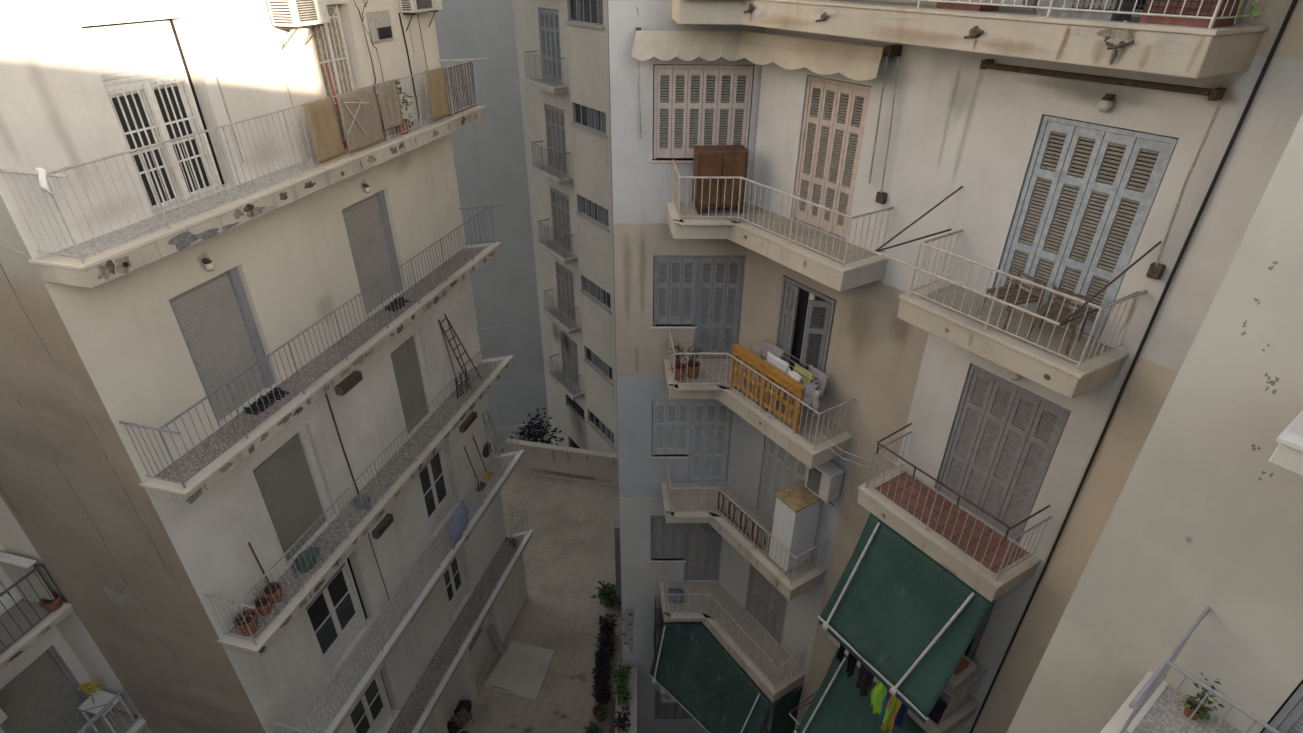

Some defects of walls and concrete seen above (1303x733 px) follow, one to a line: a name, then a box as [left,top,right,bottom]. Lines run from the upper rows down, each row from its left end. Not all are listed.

peeling [168,192,288,251]
spalling [97,256,132,279]